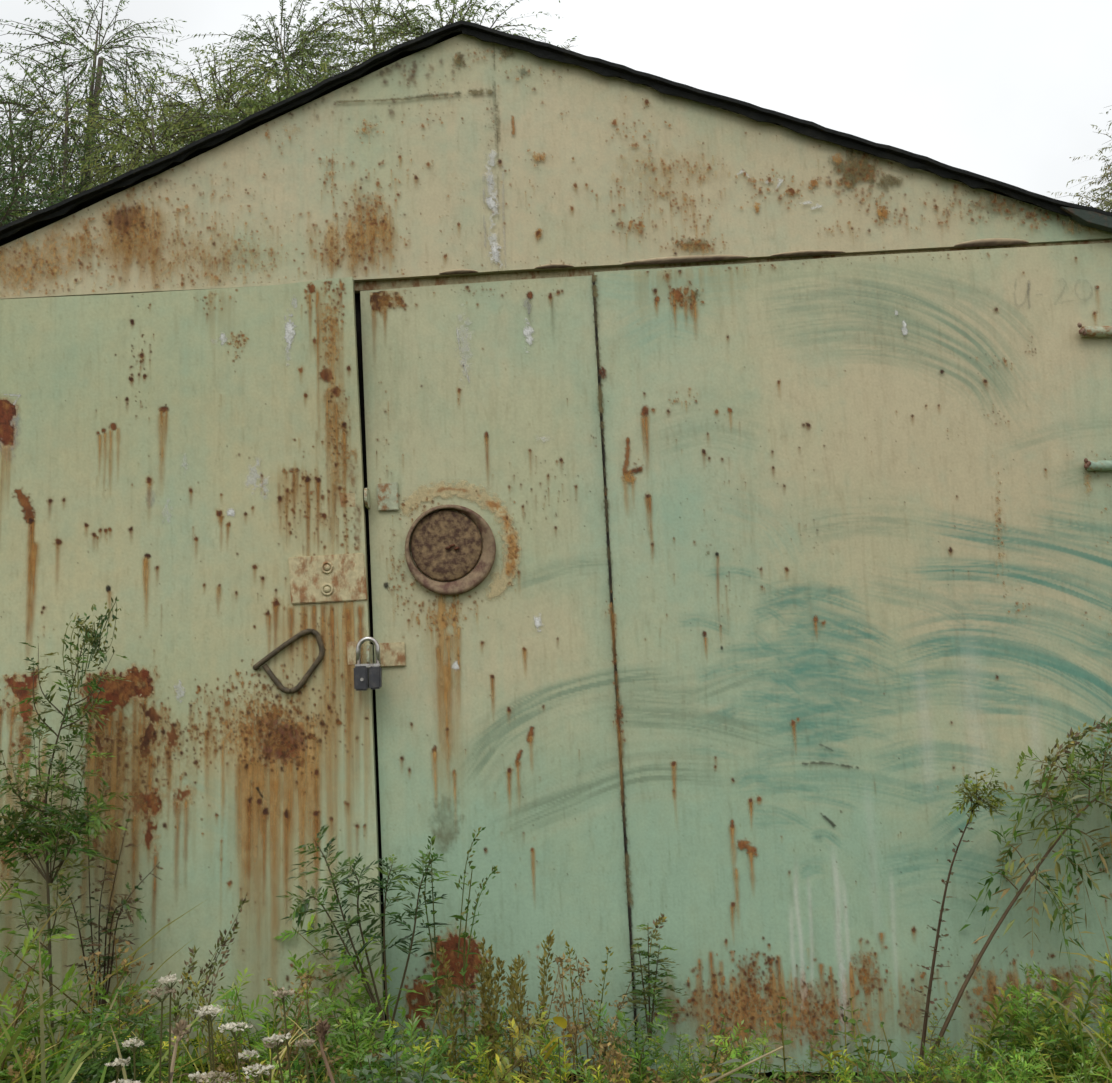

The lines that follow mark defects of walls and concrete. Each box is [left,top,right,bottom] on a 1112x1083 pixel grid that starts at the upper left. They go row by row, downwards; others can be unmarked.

corrosion [0,182,188,297]
corrosion [277,149,407,554]
corrosion [370,291,417,319]
corrosion [384,481,524,790]
corrosion [161,577,363,876]
corrosion [507,726,534,795]
corrosion [730,820,757,918]